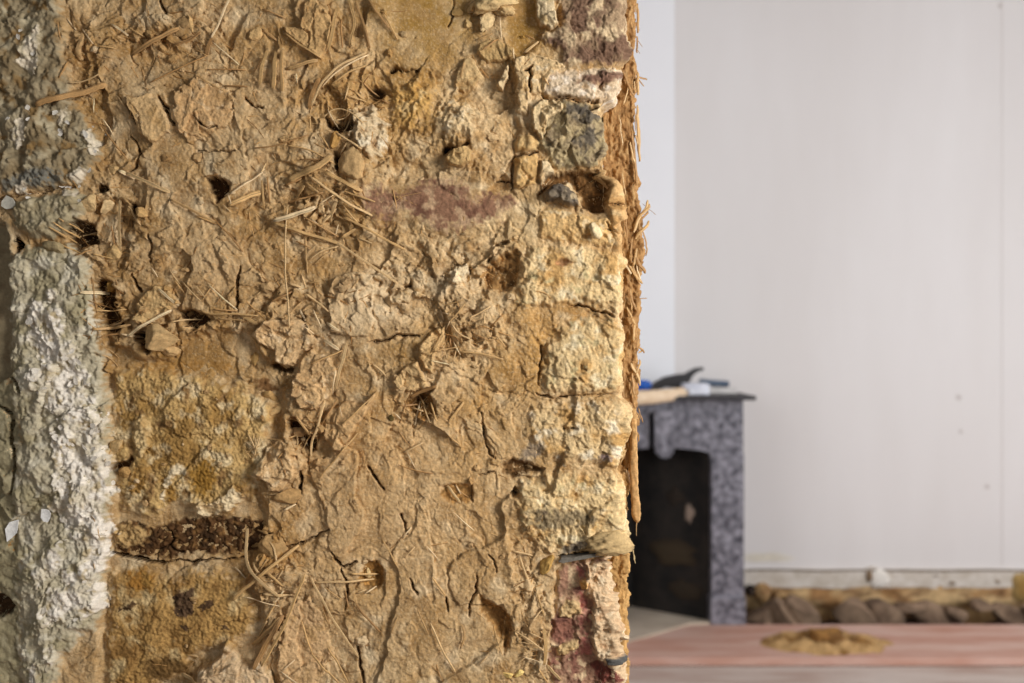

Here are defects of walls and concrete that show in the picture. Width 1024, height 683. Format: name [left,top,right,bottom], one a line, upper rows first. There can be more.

crack [158,95,235,153]
spalling [347,0,634,237]
crack [130,233,153,293]
crack [234,266,242,311]
crack [368,334,419,344]
crack [367,465,385,490]
crack [471,412,496,502]
flaking render [438,240,633,683]
crack [105,533,245,565]
crack [287,529,358,611]
crack [445,555,497,613]
crack [356,646,364,681]